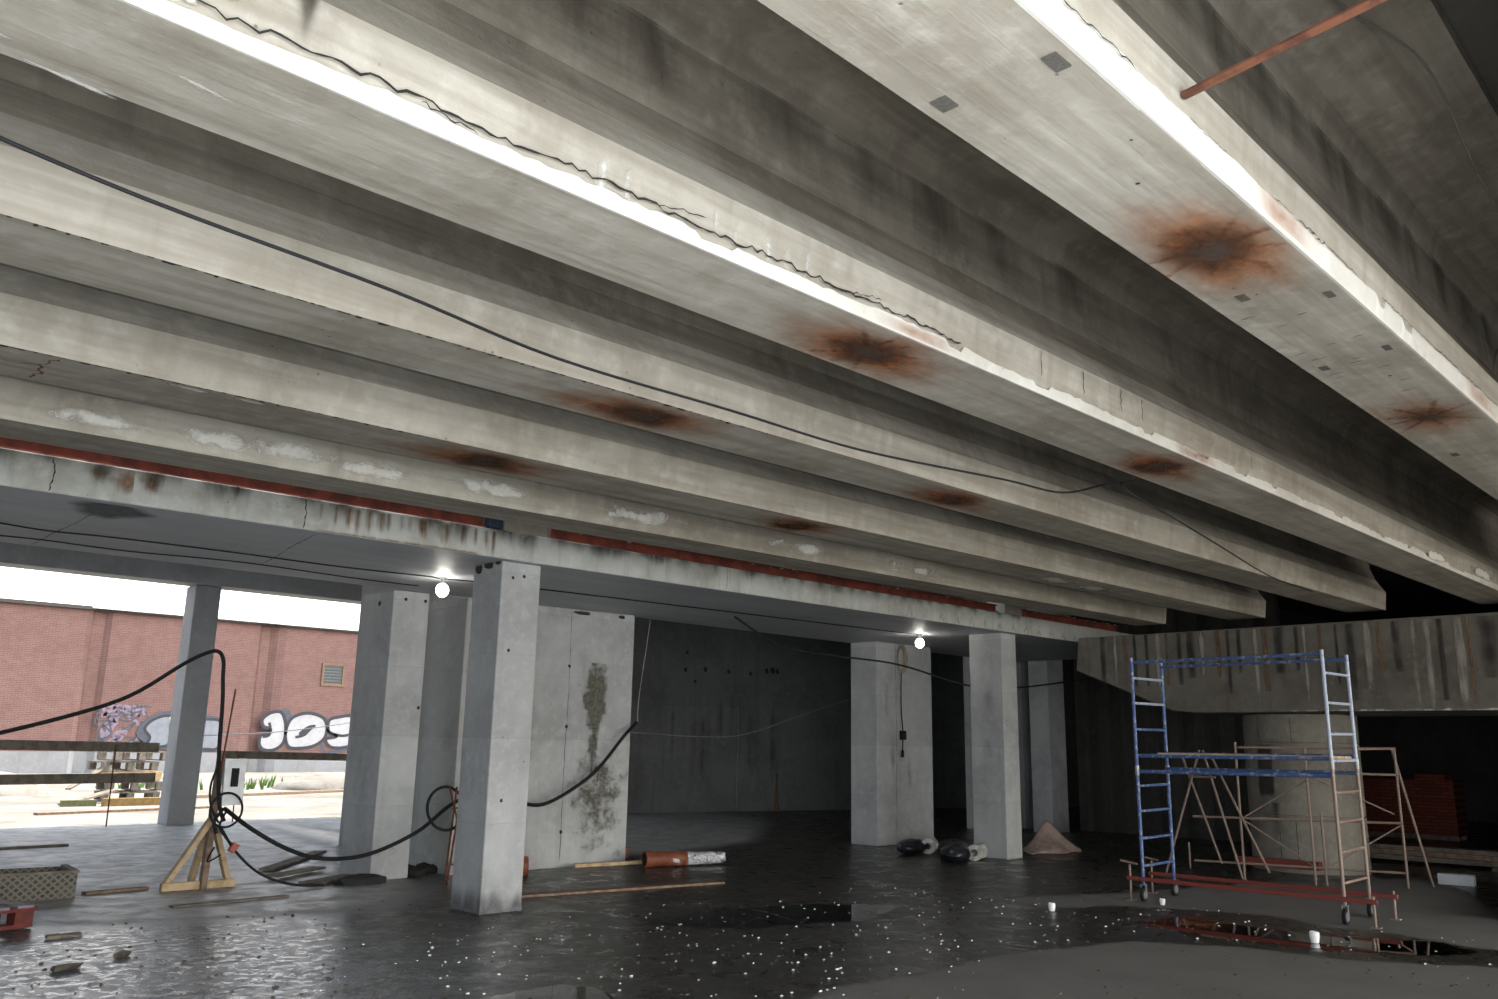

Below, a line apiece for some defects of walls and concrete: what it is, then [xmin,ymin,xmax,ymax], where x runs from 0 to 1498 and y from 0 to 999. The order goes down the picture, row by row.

crack [198,0,961,344]
rust [1158,217,1274,281]
rust [811,331,922,373]
spalling [0,345,421,436]
rust [571,398,690,427]
peeling [190,429,318,459]
peeling [343,463,403,480]
rust [430,450,536,473]
rust [1127,456,1186,477]
peeling [463,479,521,498]
peeling [609,508,666,525]
water stain [572,663,621,829]